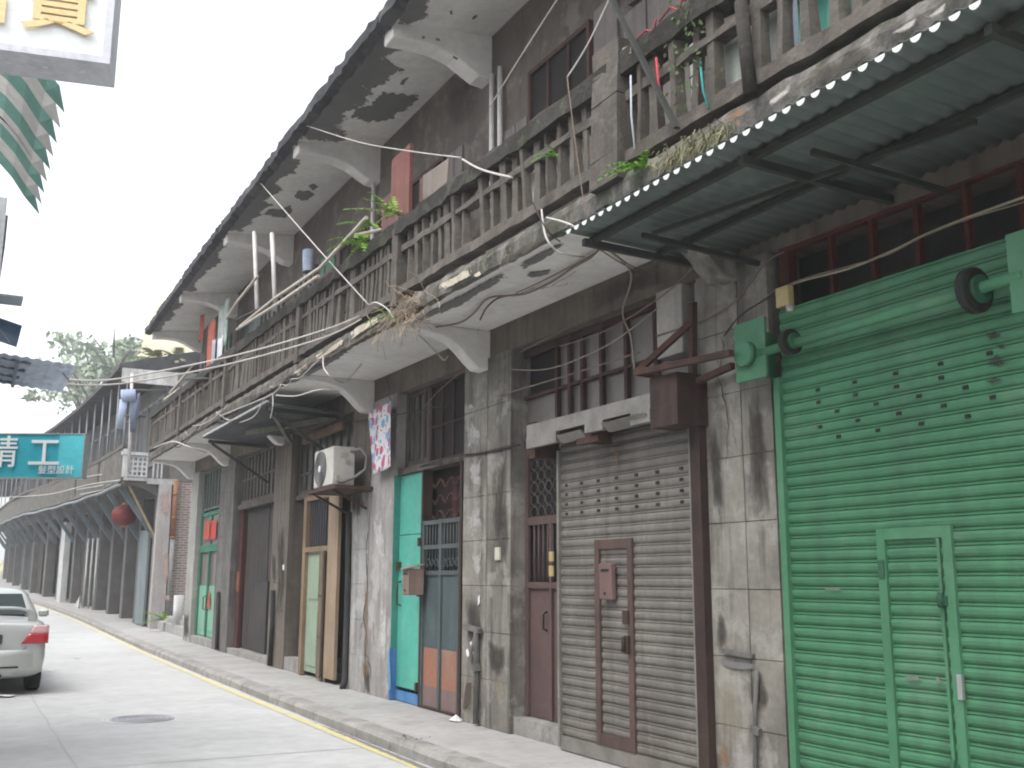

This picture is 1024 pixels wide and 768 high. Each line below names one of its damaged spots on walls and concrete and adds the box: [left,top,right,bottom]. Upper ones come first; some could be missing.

peeling [351,77,419,123]
peeling [264,184,318,218]
water stain [711,438,720,502]
water stain [749,409,767,499]
water stain [493,476,506,553]
water stain [468,595,480,645]
water stain [489,644,503,672]
water stain [751,677,765,705]